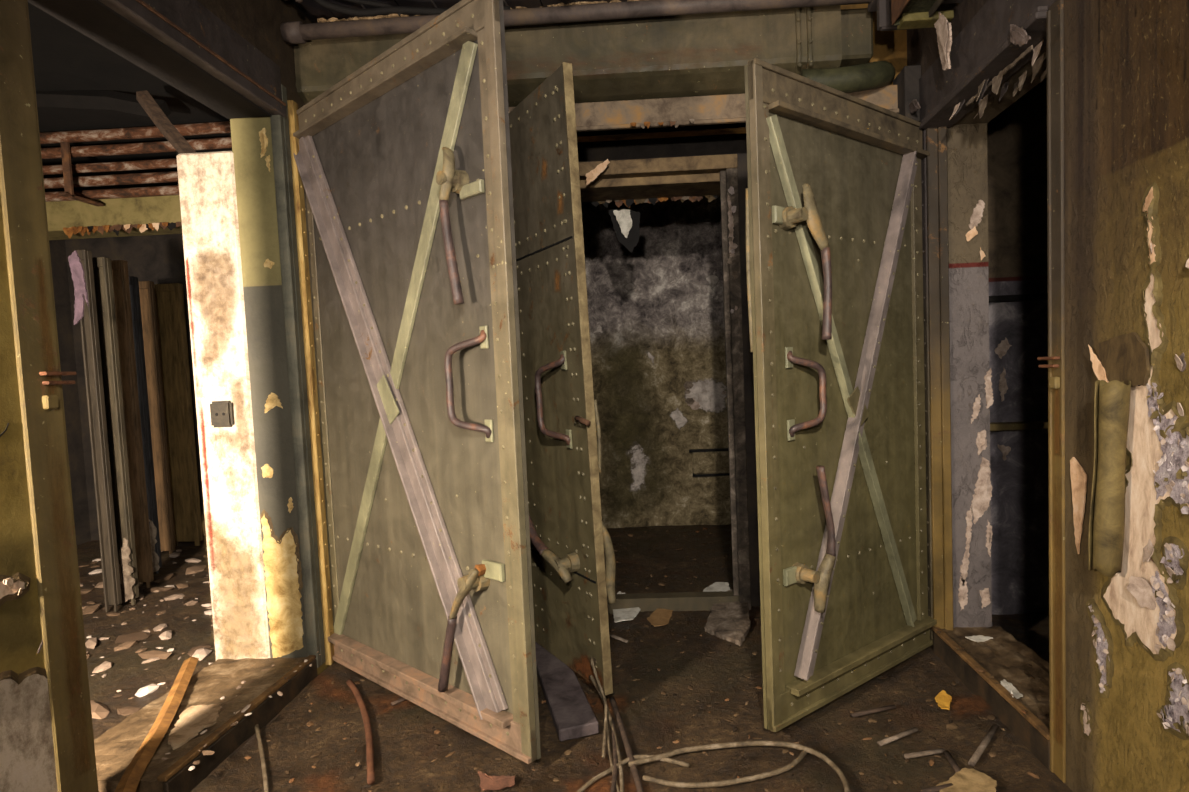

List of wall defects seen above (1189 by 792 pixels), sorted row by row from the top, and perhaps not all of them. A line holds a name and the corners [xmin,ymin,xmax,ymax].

damp [195,253,234,363]
damp [215,382,247,451]
damp [604,342,662,513]
peeling [958,337,1012,610]
peeling [1070,181,1189,741]
flaking render [0,572,31,606]
peeling [260,509,304,658]
flaking render [0,667,58,792]